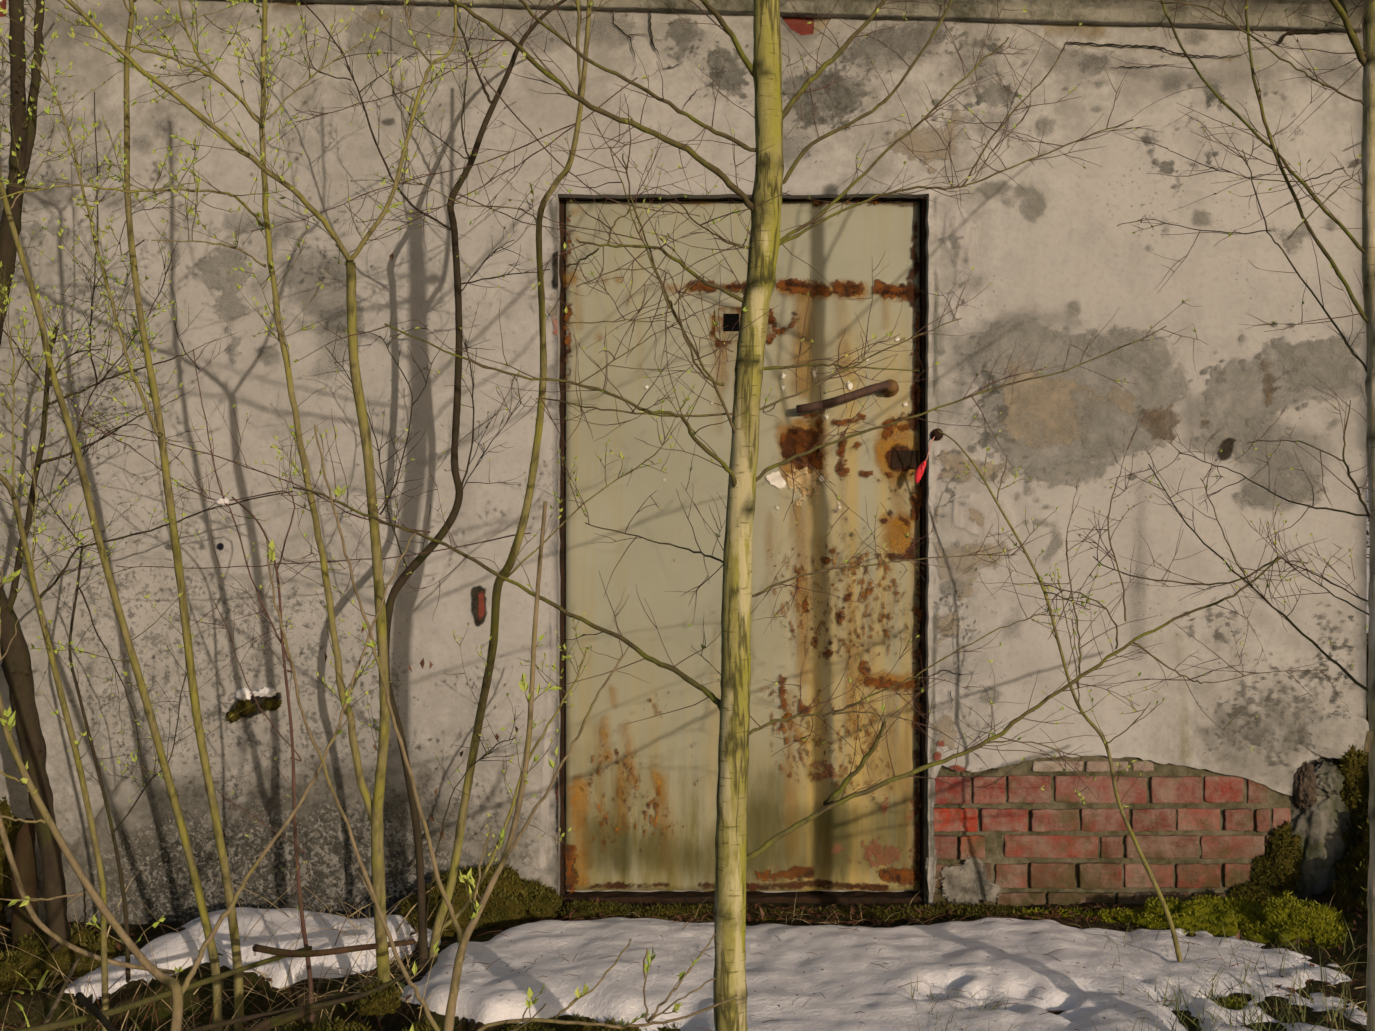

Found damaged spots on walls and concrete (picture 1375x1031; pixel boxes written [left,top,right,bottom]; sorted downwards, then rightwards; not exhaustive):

crack [1067,30,1347,68]
rust [672,280,746,293]
rust [711,315,731,347]
peeling [939,208,978,321]
rust [746,200,922,892]
peeling [935,315,1365,645]
leakage [62,743,477,924]
rust [563,732,684,893]
flaking render [924,710,1369,906]